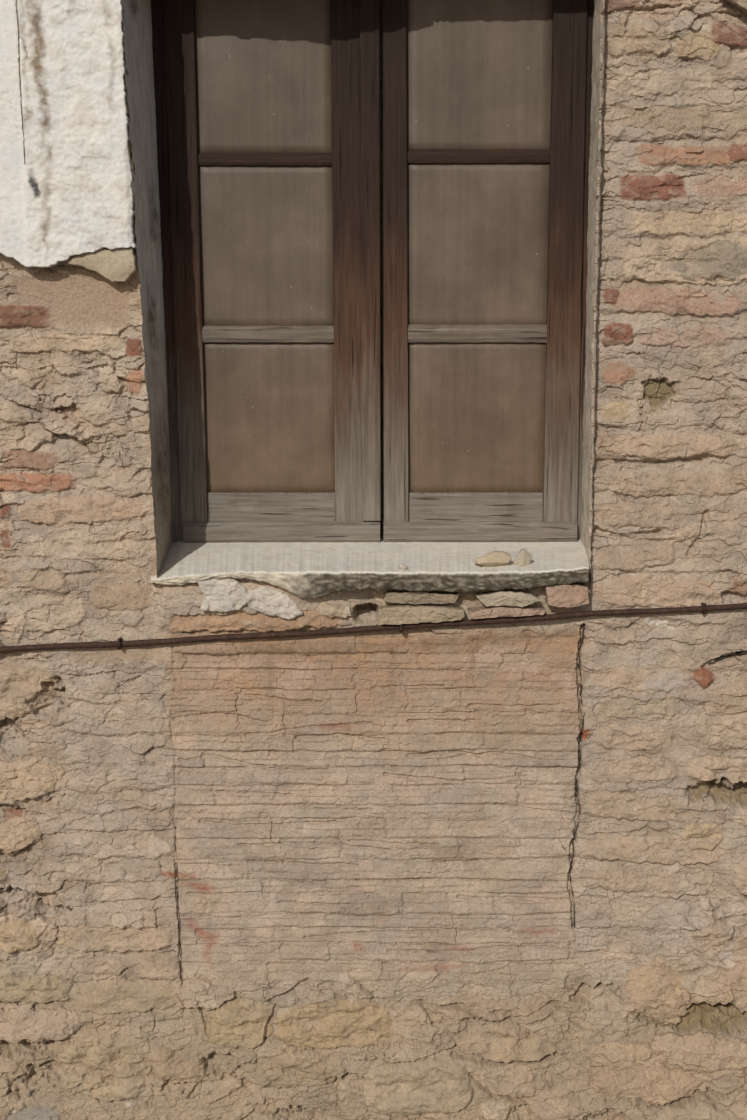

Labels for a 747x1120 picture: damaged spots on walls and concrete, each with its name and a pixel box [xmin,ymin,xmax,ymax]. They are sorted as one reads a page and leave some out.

peeling [726,0,747,14]
leakage [32,10,48,126]
spalling [178,578,329,619]
spalling [378,582,589,625]
spalling [642,617,675,631]
crack [559,625,593,928]